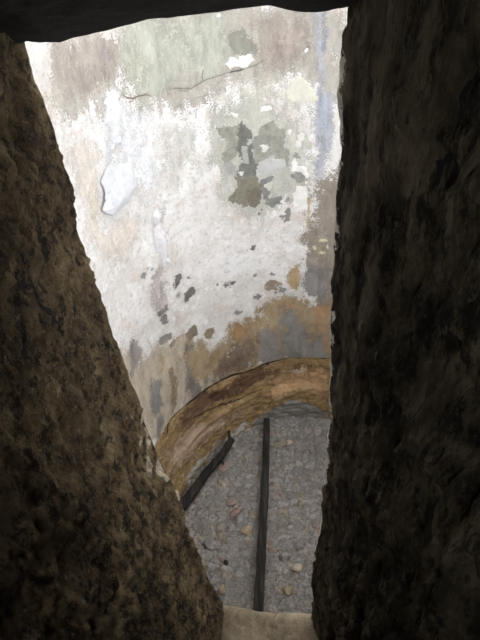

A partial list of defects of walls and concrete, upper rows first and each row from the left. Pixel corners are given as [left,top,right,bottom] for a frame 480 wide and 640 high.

crack [123,92,151,102]
crack [170,59,267,119]
flaking render [100,152,137,217]
flaking render [216,112,309,223]
damp [118,330,225,441]